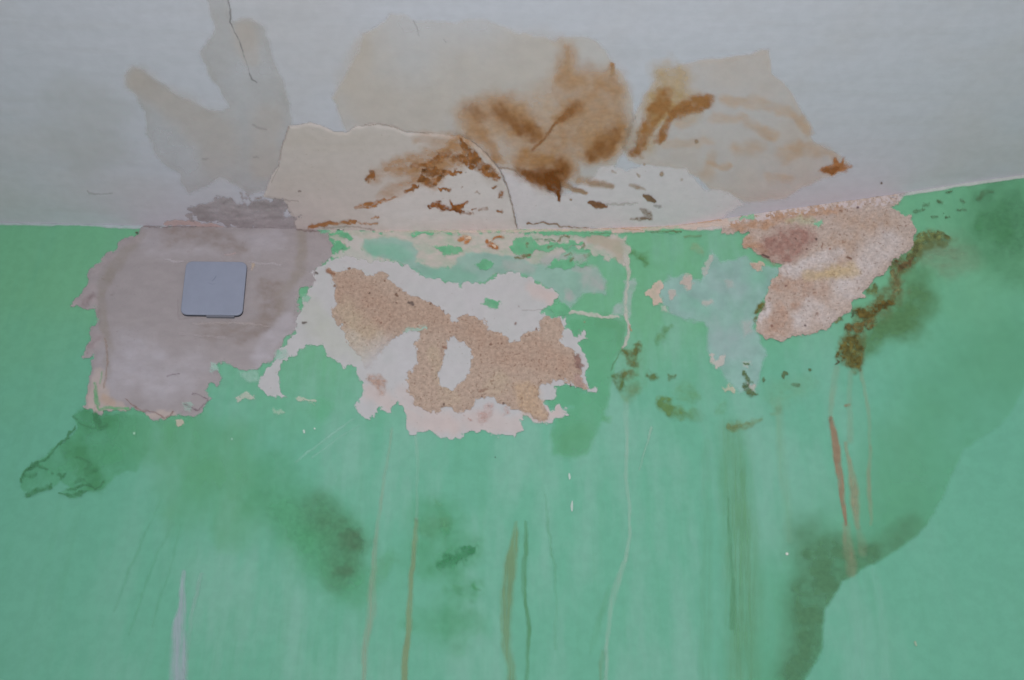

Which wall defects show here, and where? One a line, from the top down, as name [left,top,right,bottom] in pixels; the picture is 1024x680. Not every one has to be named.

water stain [127,68,288,193]
water stain [201,7,268,95]
water stain [334,29,600,163]
rust [308,61,712,228]
water stain [581,51,847,201]
peeling [236,123,1024,439]
water stain [835,231,964,370]
water stain [974,191,1024,257]
rust [829,417,857,525]
water stain [882,461,944,541]
water stain [777,537,881,680]